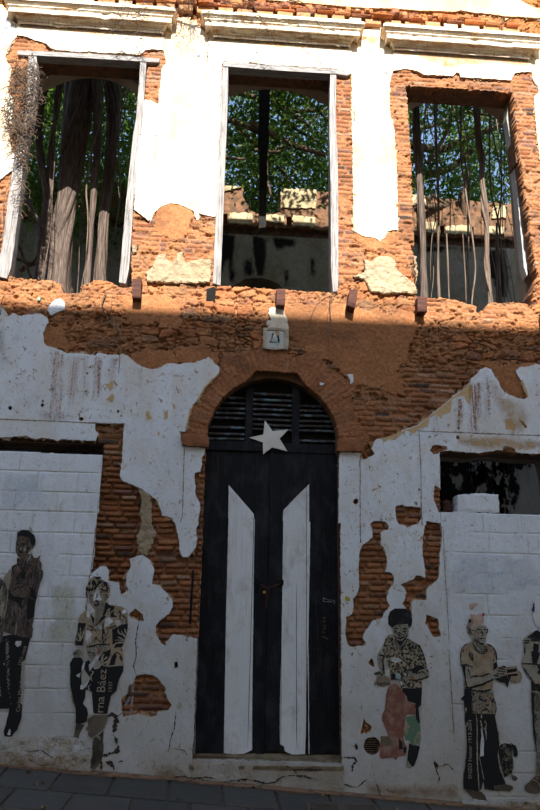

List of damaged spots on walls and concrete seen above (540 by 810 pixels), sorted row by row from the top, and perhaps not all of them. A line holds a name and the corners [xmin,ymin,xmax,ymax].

spalling [176,5,205,31]
spalling [328,6,540,40]
spalling [521,0,540,9]
spalling [6,36,60,151]
spalling [136,50,166,103]
spalling [0,64,540,459]
spalling [434,487,453,512]
spalling [91,424,206,645]
spalling [345,505,442,647]
spalling [121,674,172,716]